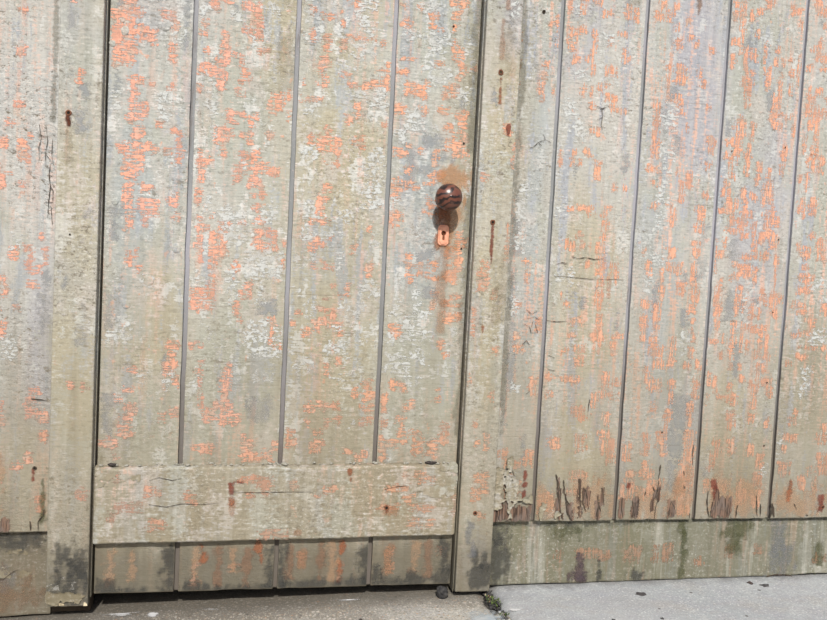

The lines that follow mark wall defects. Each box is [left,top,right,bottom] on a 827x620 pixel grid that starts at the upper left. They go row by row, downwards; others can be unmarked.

peeling [536,0,640,182]
peeling [7,231,51,303]
peeling [108,0,478,381]
rust [435,199,466,249]
peeling [504,180,532,317]
peeling [509,203,624,399]
peeling [161,338,204,391]
peeling [190,360,297,463]
peeling [75,471,168,533]
peeling [469,419,561,521]
water stain [567,552,587,582]
water stain [678,522,687,578]